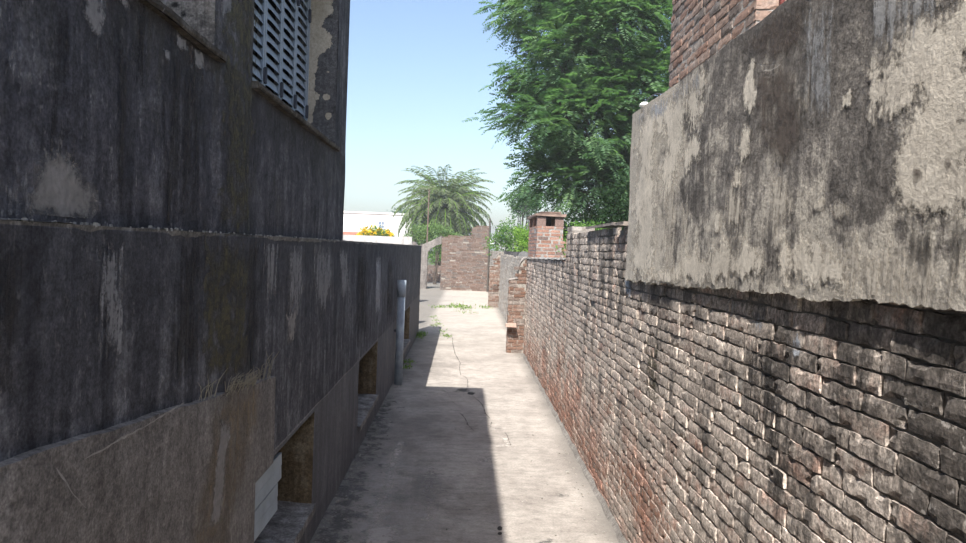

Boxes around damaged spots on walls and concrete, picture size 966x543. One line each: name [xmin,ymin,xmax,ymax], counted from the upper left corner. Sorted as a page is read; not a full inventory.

water stain [874,0,934,44]
peeling [307,0,334,124]
water stain [805,8,833,110]
flaking render [8,153,98,219]
water stain [910,222,930,276]
water stain [646,343,657,414]
water stain [734,341,794,515]